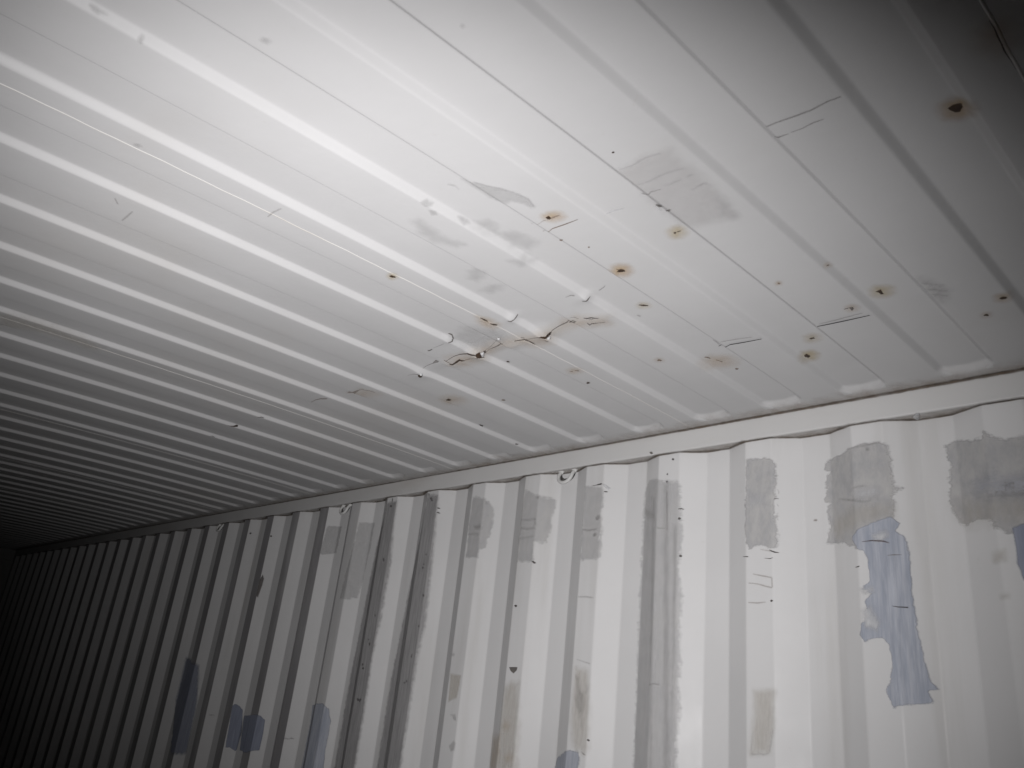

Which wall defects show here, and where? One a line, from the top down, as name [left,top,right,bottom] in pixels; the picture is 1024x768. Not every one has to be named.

crack [415,318,603,378]